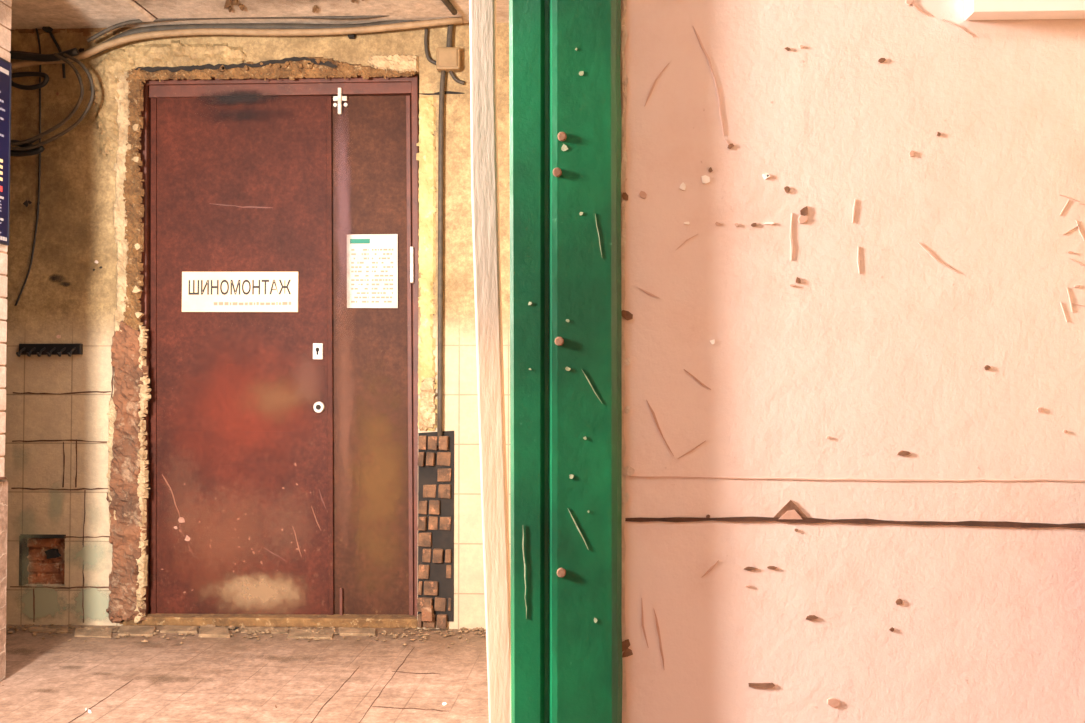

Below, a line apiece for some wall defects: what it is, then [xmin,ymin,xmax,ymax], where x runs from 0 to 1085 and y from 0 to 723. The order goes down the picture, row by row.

flaking render [19,57,415,639]
flaking render [416,95,454,629]